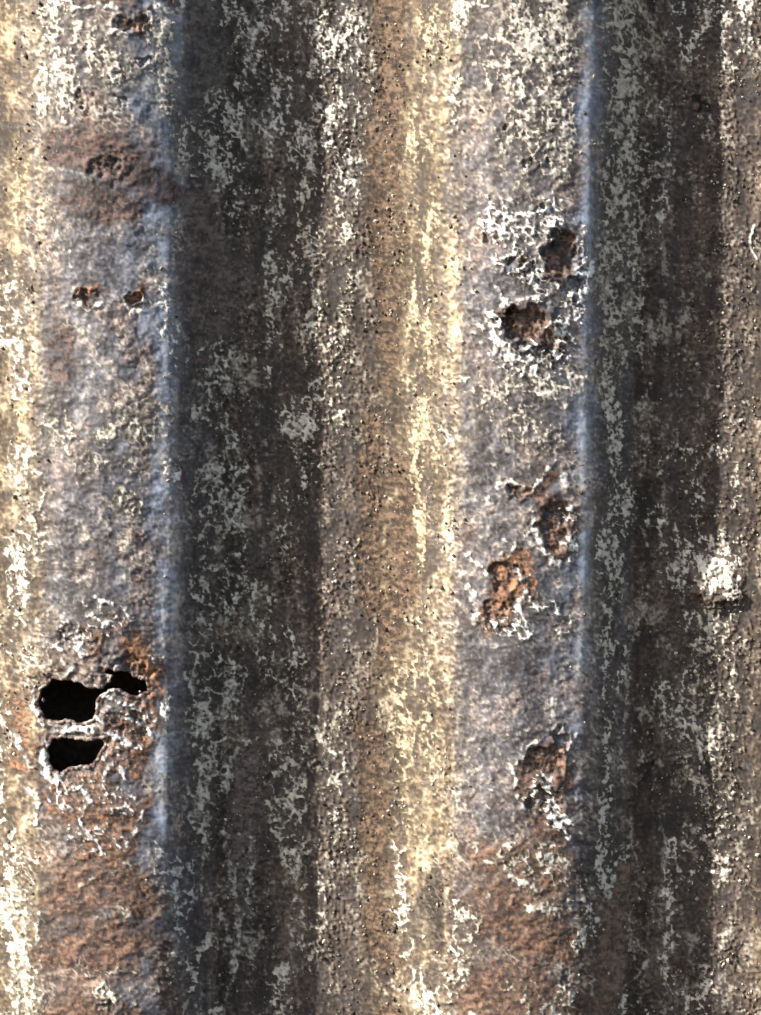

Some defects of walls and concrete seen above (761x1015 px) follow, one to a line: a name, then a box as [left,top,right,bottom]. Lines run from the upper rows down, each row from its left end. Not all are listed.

rust [502,231,577,284]
rust [75,283,101,308]
rust [126,282,146,305]
rust [490,303,568,363]
rust [507,464,582,566]
rust [476,545,539,636]
rust [6,611,168,973]
rust [453,739,583,1015]
rust [43,996,144,1015]